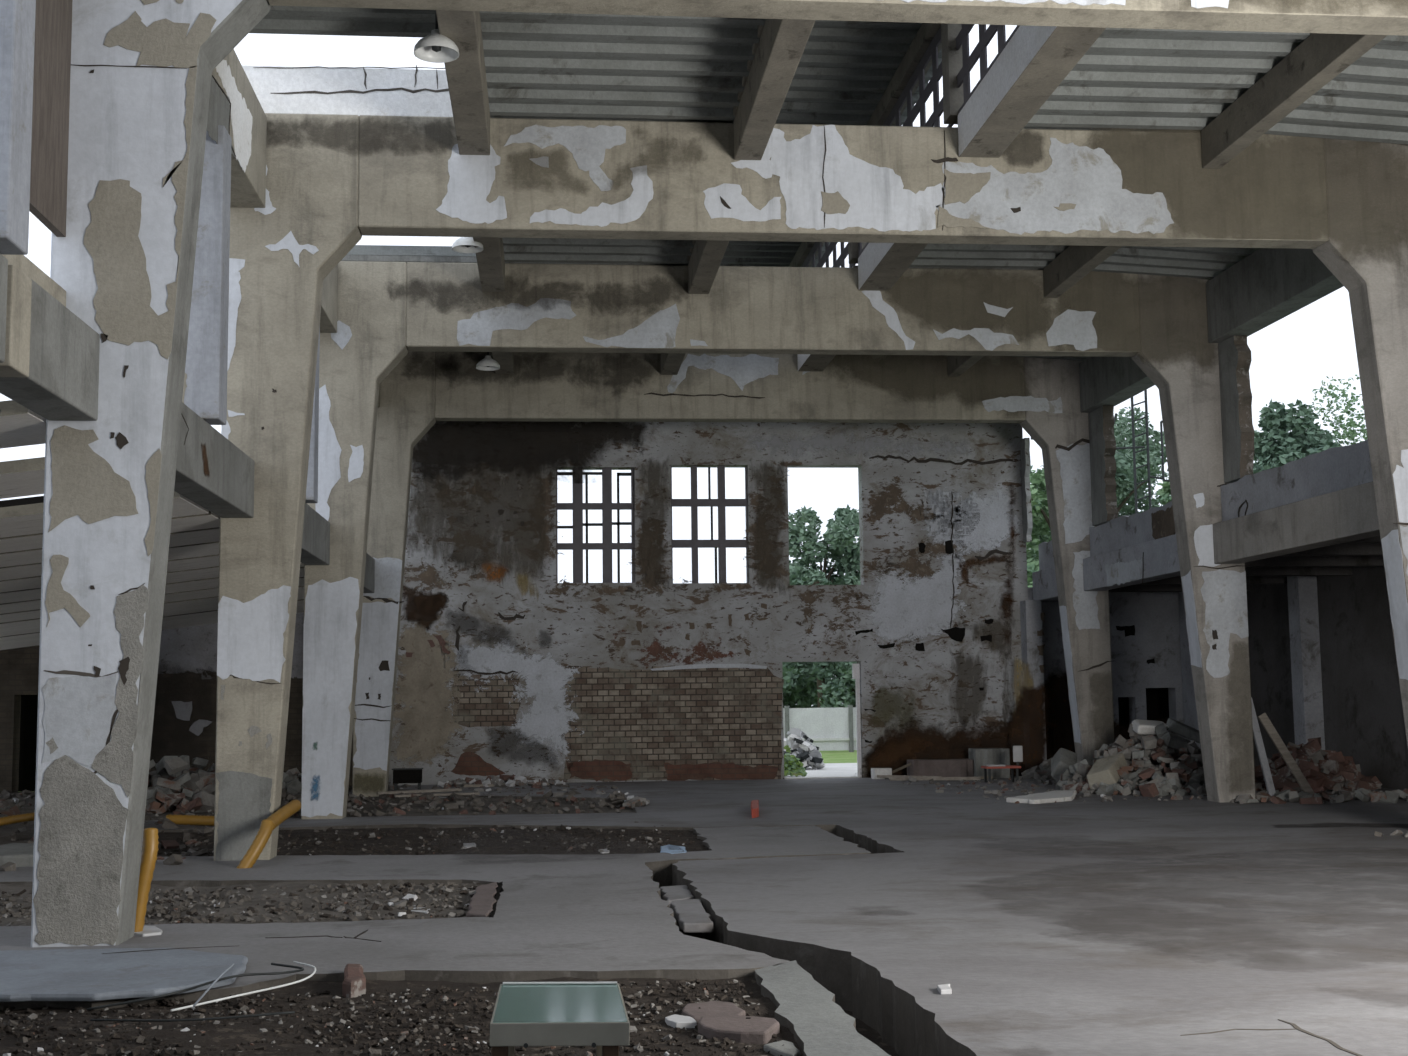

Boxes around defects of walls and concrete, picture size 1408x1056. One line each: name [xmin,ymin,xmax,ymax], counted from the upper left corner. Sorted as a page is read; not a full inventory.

peeling [83,0,235,359]
peeling [731,131,773,179]
peeling [821,191,850,214]
peeling [931,157,991,229]
peeling [984,302,1013,317]
peeling [48,425,162,556]
peeling [45,554,90,627]
flaking render [540,462,970,782]
flaking render [452,672,521,727]
spalling [33,584,149,946]
flaking render [451,752,505,776]
crack [1180,1019,1362,1056]